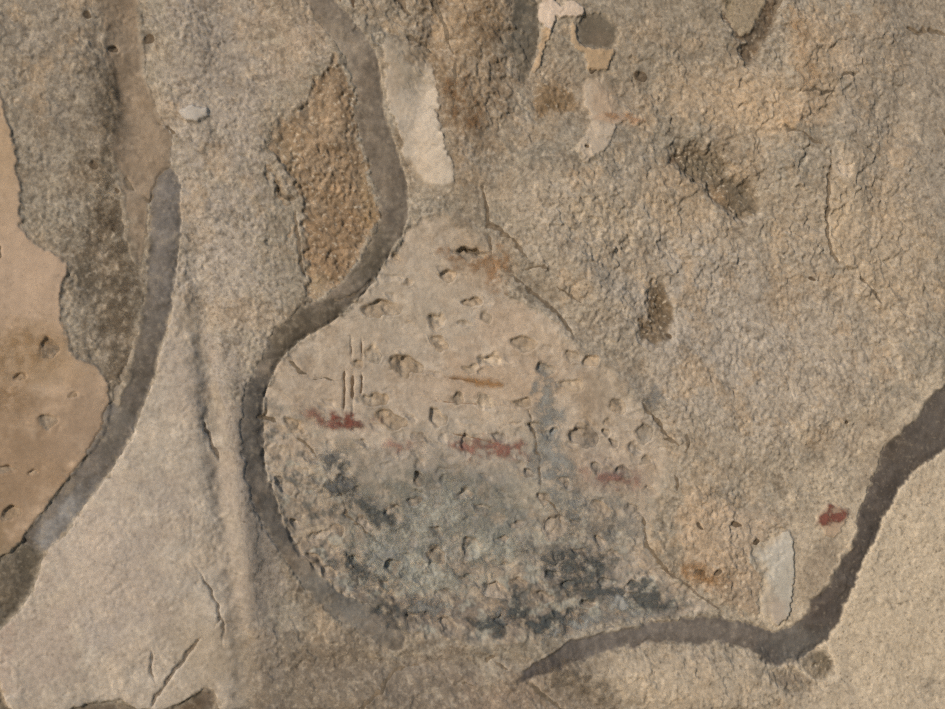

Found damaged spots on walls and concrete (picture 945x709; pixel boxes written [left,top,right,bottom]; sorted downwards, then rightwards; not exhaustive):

peeling [538,0,584,30]
spalling [262,51,382,300]
crack [784,123,882,303]
spalling [40,337,60,359]
crack [202,576,225,637]
crack [150,639,199,707]